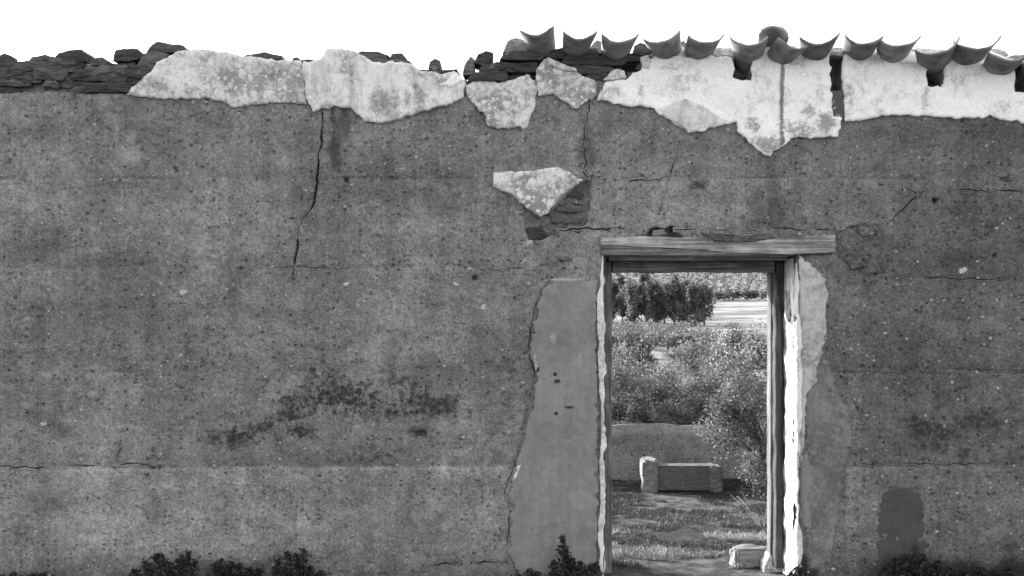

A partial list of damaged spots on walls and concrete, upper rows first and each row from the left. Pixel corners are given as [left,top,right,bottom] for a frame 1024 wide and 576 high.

crack [240,109,393,278]
peeling [493,167,589,240]
crack [555,100,835,234]
crack [887,186,1024,224]
crack [0,429,159,471]
leakage [199,370,459,450]
peeling [508,277,599,576]
peeling [798,346,865,574]